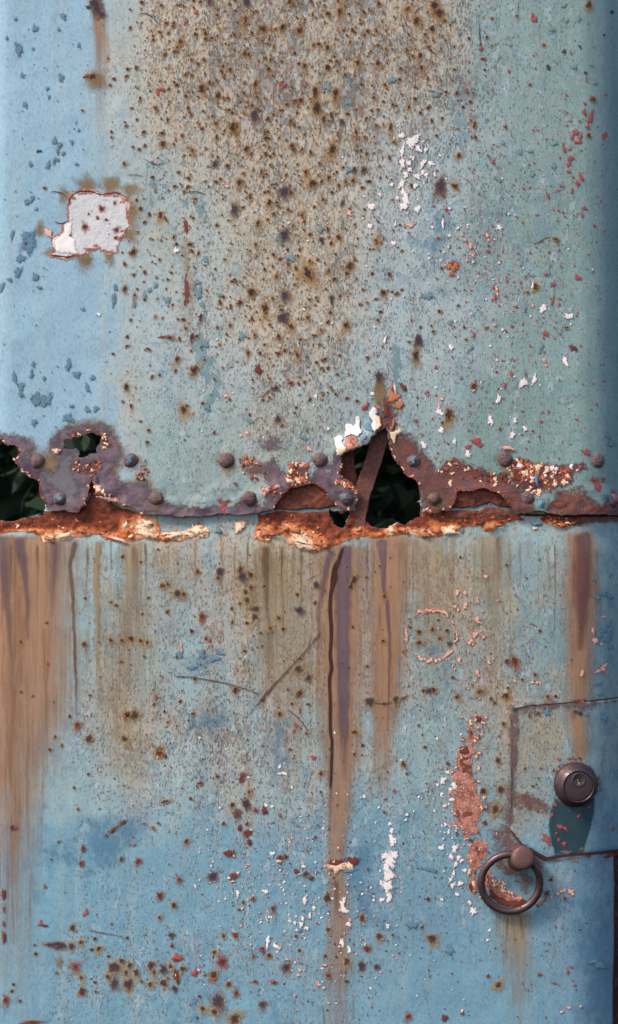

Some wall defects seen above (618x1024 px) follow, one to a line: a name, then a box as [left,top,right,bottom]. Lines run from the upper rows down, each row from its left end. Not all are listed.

peeling [0,160,168,293]
corrosion [83,0,494,413]
peeling [366,132,437,230]
corrosion [0,345,618,984]
peeling [338,813,409,927]
corrosion [33,892,301,1024]